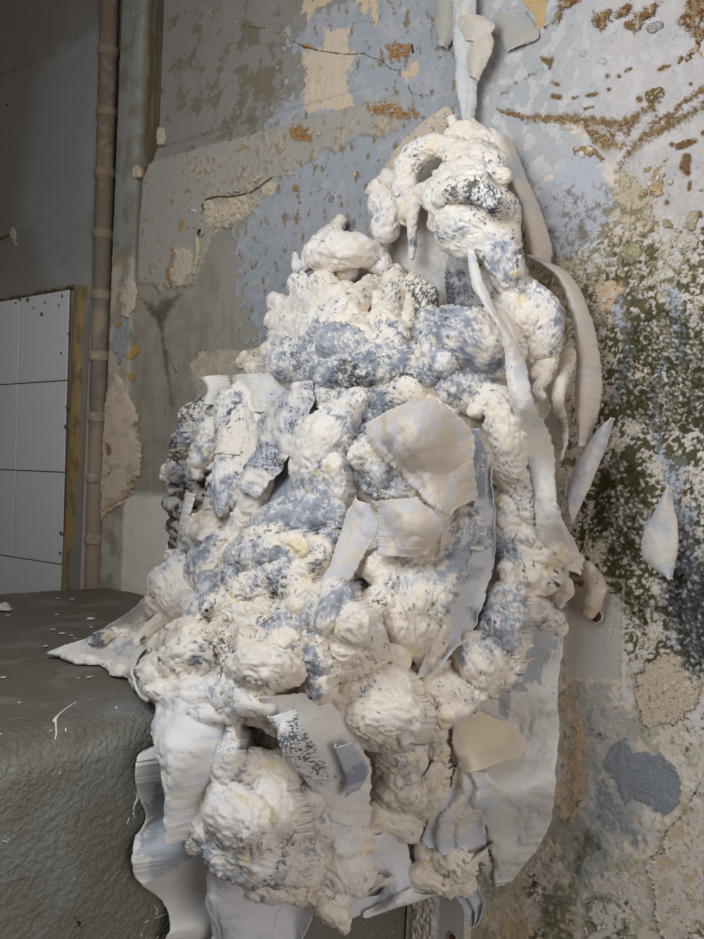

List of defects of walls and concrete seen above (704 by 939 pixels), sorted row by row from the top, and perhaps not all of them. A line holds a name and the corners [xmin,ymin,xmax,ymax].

crack [201,6,427,97]
peeling [434,0,548,120]
spalling [571,145,604,161]
flaking render [166,247,194,287]
flaking render [99,258,142,522]
leakage [615,310,704,432]
leakage [593,457,704,677]
peeling [583,737,704,939]